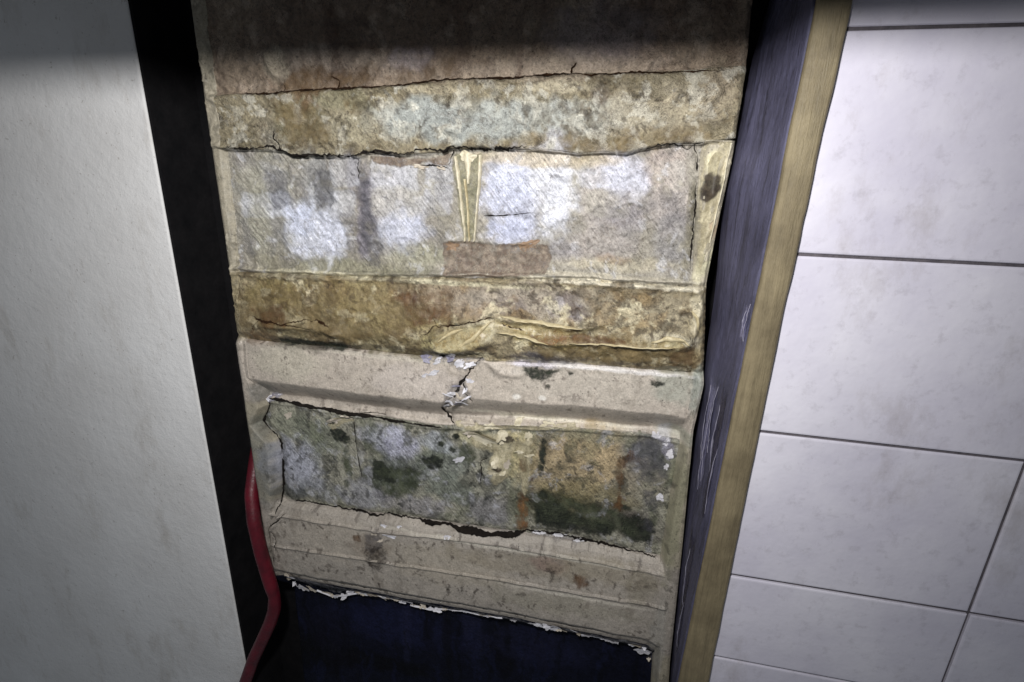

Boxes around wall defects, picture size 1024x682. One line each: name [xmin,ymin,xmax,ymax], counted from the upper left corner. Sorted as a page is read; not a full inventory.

crack [222,63,721,96]
crack [224,131,526,178]
crack [252,316,329,331]
leakage [329,419,352,486]
leakage [372,434,476,498]
crack [263,354,655,573]
leakage [538,439,547,471]
leakage [534,490,653,542]
peeling [284,573,651,662]